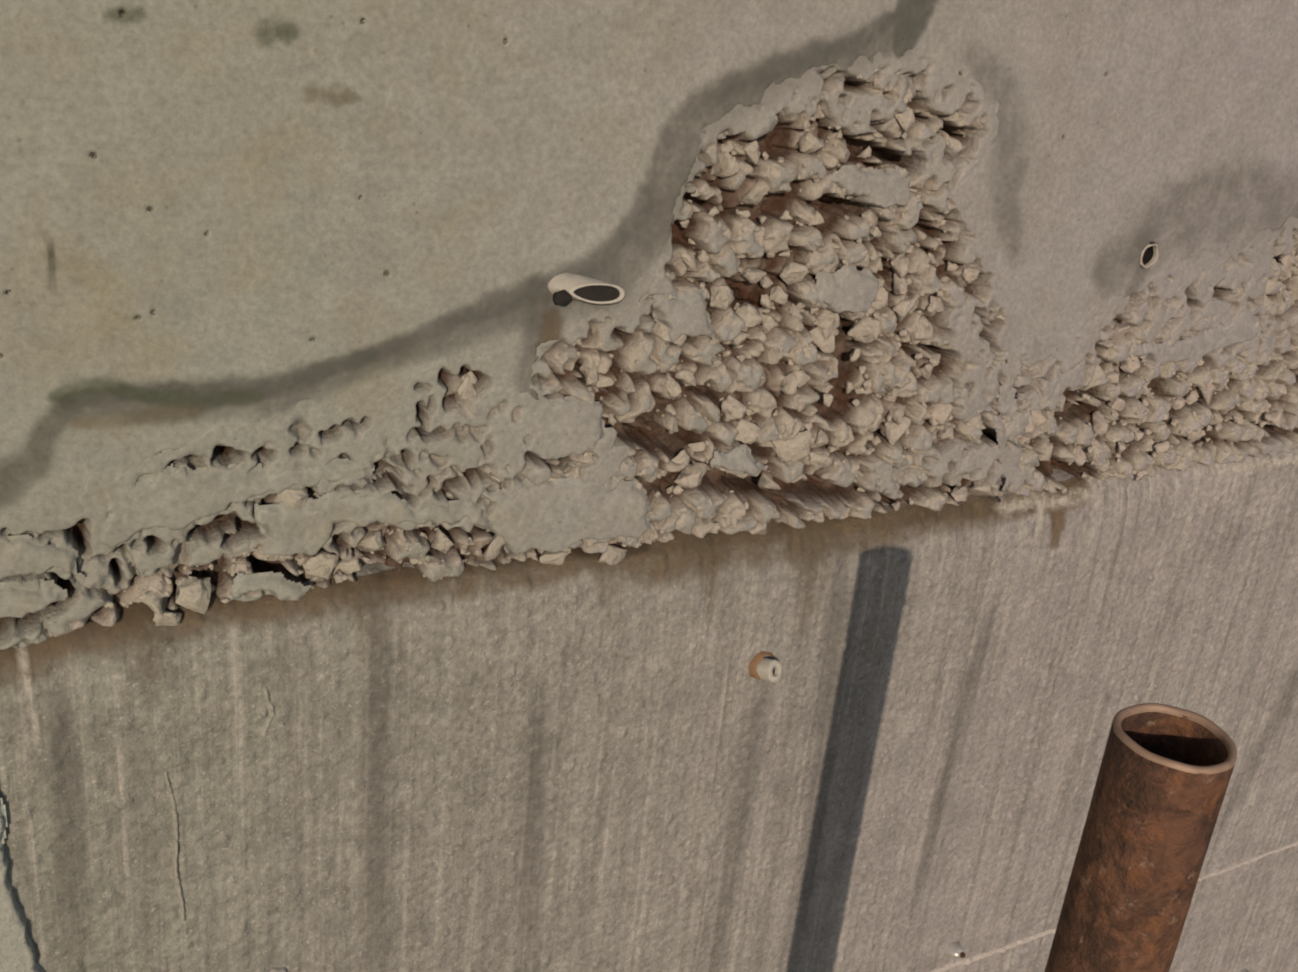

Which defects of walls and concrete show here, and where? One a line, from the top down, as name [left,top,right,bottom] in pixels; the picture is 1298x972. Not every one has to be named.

leakage [885,0,937,57]
flaking render [709,140,769,205]
flaking render [798,120,874,171]
flaking render [710,261,810,349]
flaking render [802,244,945,362]
leakage [62,339,411,416]
flaking render [665,368,696,400]
flaking render [707,395,851,469]
flaking render [671,441,714,489]
flaking render [303,531,386,583]
flaking render [430,528,472,553]
flaking render [138,574,211,626]